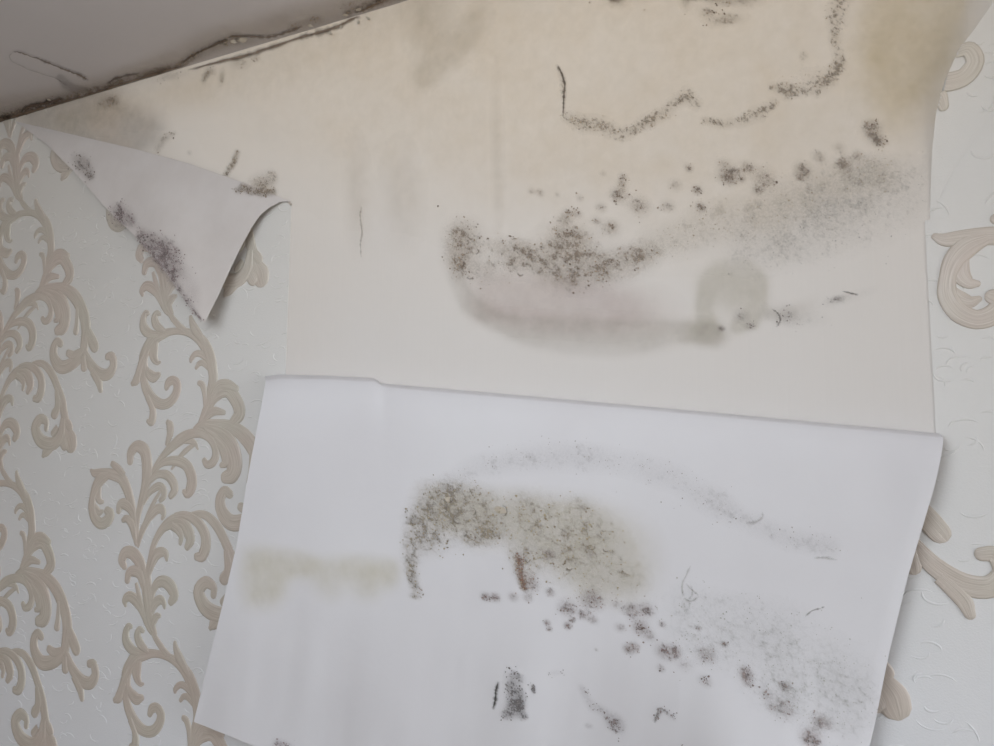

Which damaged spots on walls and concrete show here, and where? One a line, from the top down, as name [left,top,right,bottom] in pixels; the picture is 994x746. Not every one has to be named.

crack [0,0,386,122]
leakage [560,90,694,141]
leakage [754,0,850,113]
leakage [234,172,275,198]
leakage [663,118,900,257]
leakage [104,200,204,322]
leakage [442,206,659,294]
leakage [402,470,729,683]
leakage [501,666,536,721]
leakage [734,609,873,746]